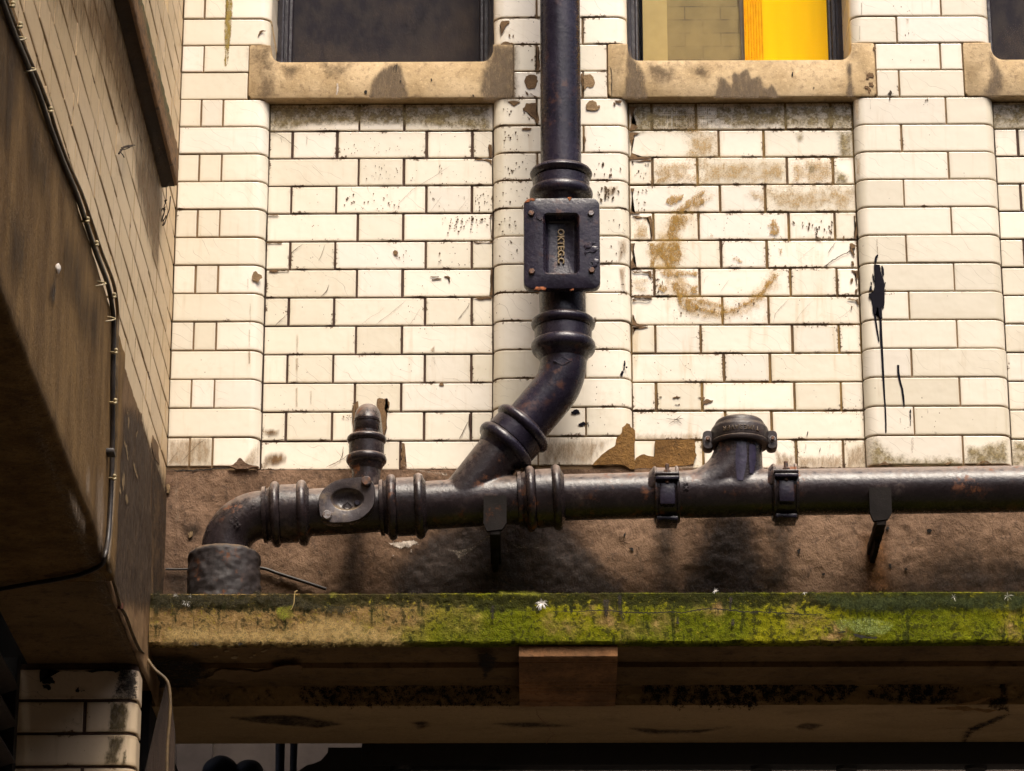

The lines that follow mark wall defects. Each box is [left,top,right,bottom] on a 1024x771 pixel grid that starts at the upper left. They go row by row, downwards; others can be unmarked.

water stain [370,64,407,98]
water stain [715,69,780,98]
water stain [635,108,850,315]
spalling [377,398,390,435]
spalling [592,423,697,470]
water stain [659,517,789,593]
water stain [165,618,400,643]
water stain [106,669,138,764]